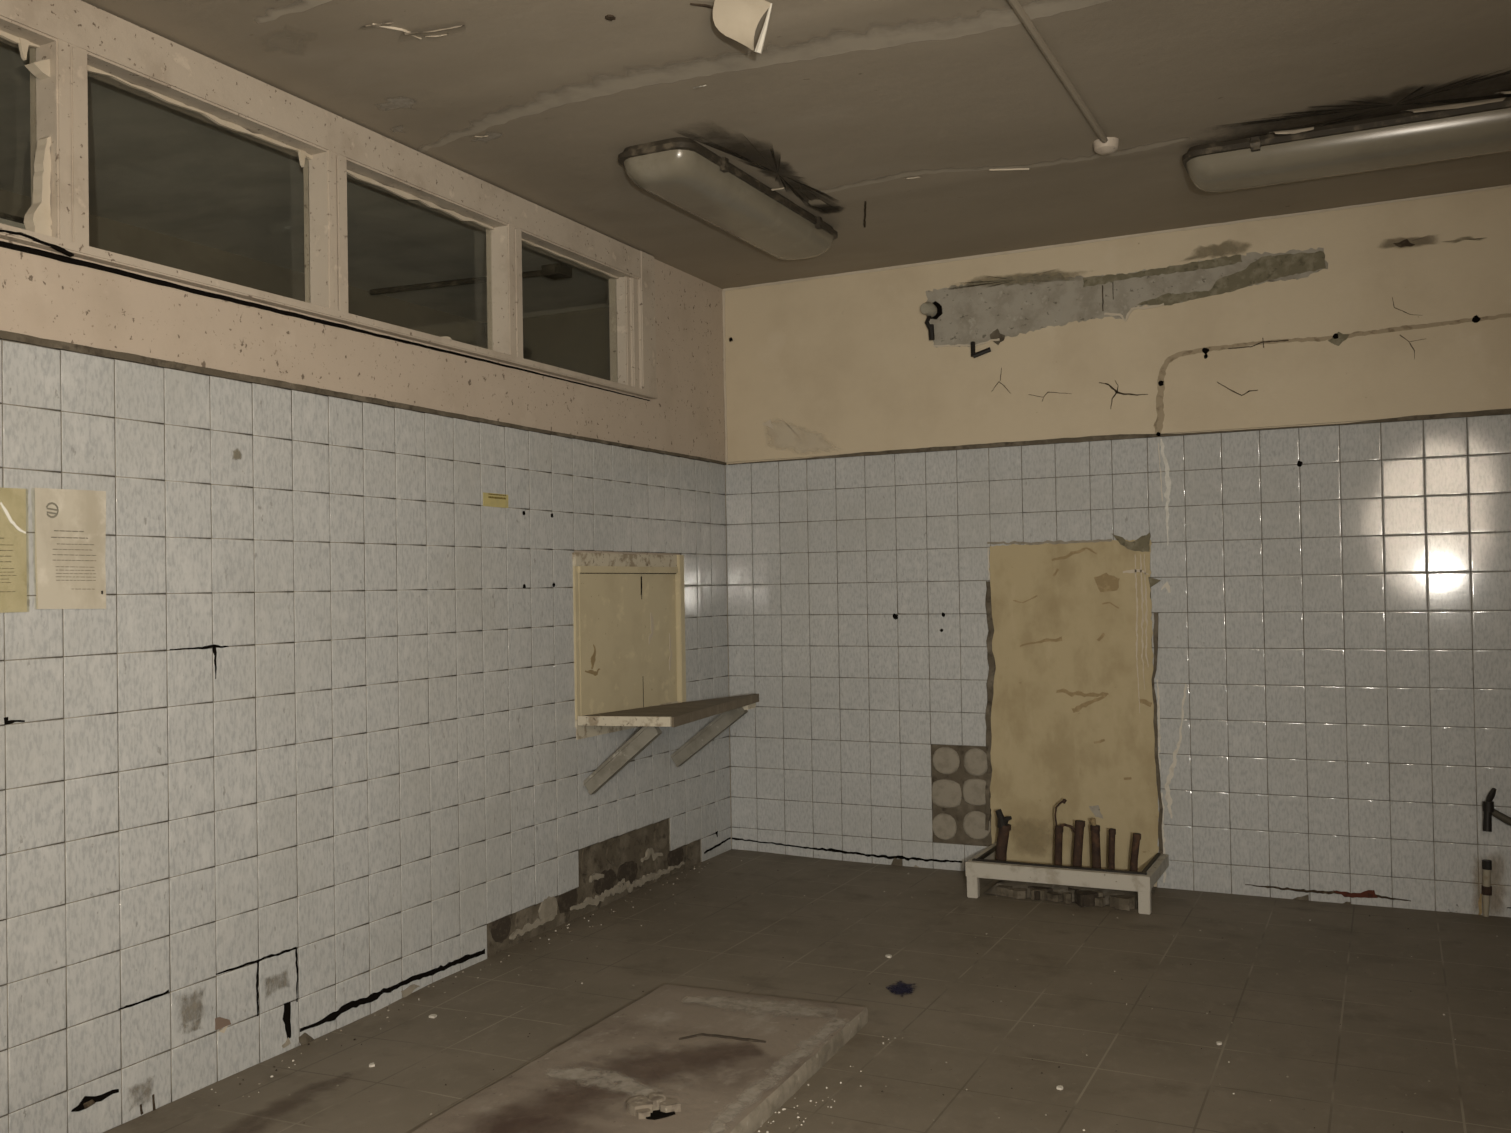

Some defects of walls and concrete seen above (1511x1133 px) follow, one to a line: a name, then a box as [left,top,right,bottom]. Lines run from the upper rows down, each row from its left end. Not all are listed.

peeling [926,242,1328,348]
crack [991,368,1148,409]
crack [170,644,229,679]
peeling [487,818,700,957]
crack [1245,884,1411,904]
crack [216,947,485,1048]